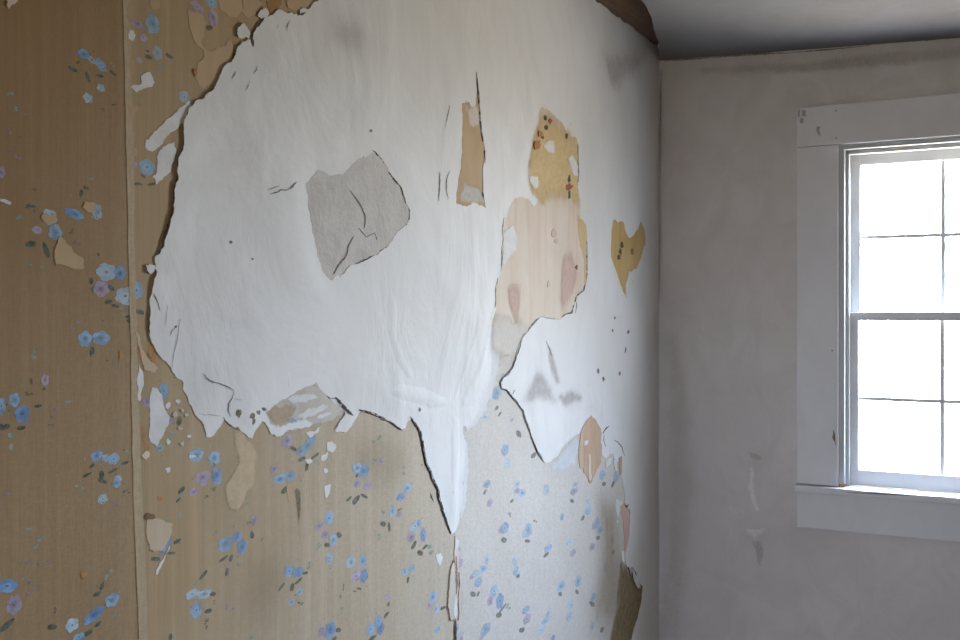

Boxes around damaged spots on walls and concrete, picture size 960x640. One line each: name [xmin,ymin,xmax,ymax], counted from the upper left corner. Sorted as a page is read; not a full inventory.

peeling [131,72,154,92]
peeling [187,0,312,88]
peeling [145,101,191,184]
peeling [456,94,486,207]
flaking render [306,152,409,281]
peeling [490,107,587,362]
peeling [611,219,645,298]
peeling [149,387,197,458]
flaking render [236,382,344,438]
peeling [578,416,622,483]
peeling [145,513,173,575]
peeling [610,499,643,640]